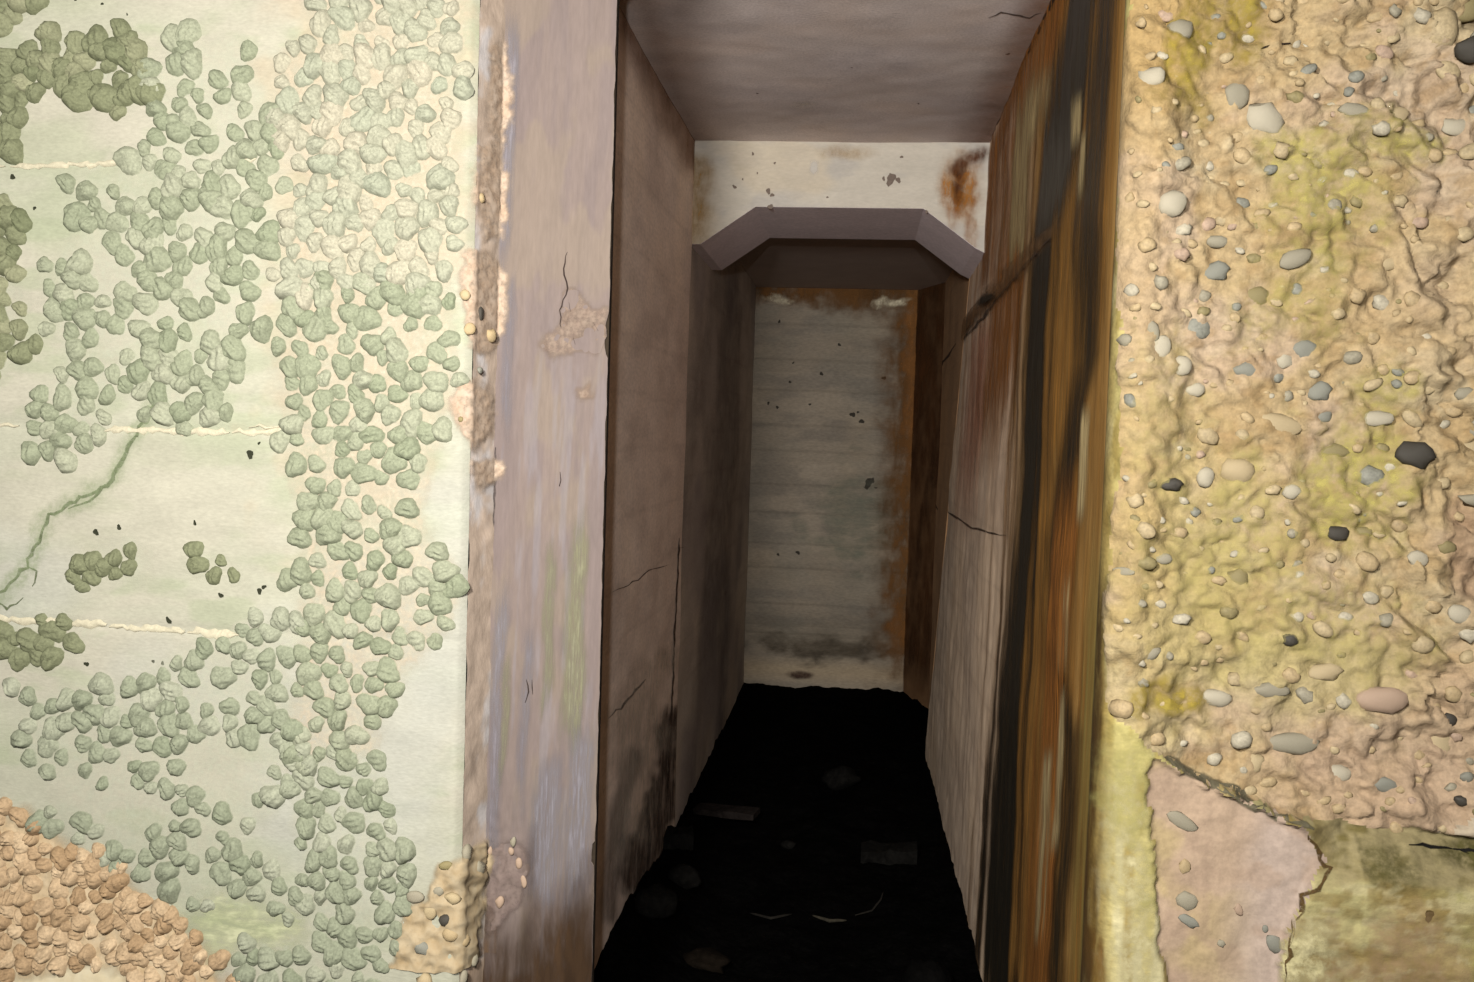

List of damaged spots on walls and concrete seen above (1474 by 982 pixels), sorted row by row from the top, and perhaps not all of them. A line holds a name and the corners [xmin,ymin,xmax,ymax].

corrosion [942,0,1063,441]
crack [0,405,153,610]
spalling [1101,0,1474,982]
crack [1409,842,1474,853]
leakage [1280,926,1351,982]